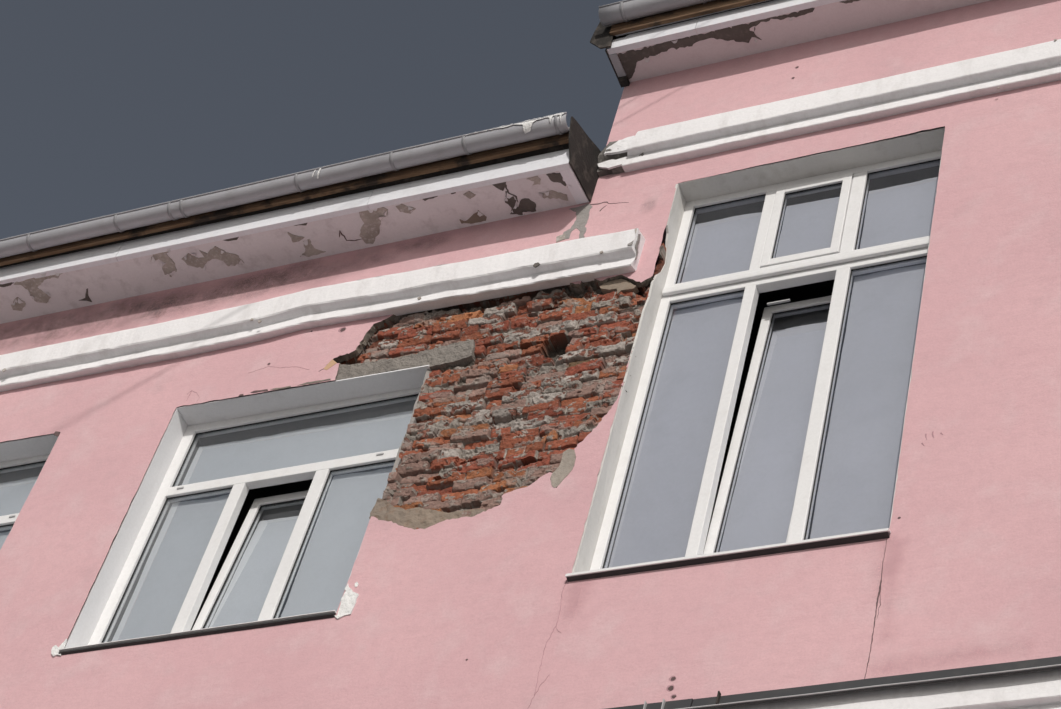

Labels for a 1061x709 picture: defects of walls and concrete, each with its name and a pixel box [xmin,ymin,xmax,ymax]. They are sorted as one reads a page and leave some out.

peeling [617,8,815,79]
peeling [150,237,244,277]
peeling [288,223,326,257]
peeling [359,196,438,244]
peeling [460,210,487,224]
flaking render [493,173,592,243]
peeling [0,272,62,311]
flaking render [239,243,666,517]
crack [864,540,887,679]